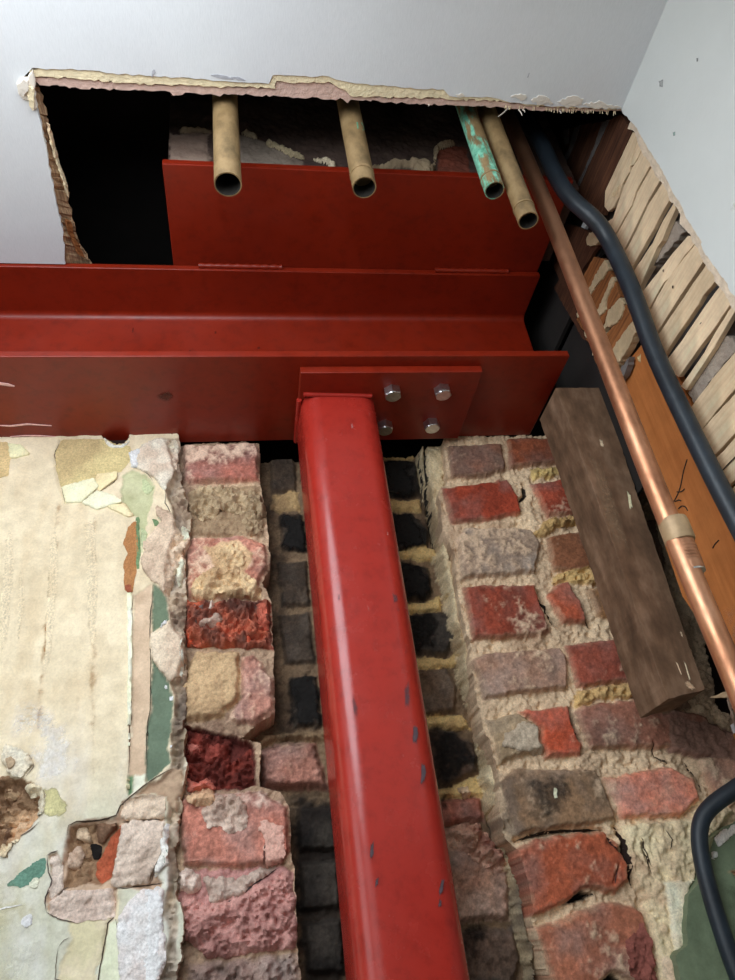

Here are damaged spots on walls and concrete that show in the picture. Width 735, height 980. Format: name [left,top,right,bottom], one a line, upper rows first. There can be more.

spalling [628,121,735,311]
spalling [61,437,272,701]
spalling [7,794,170,980]
spalling [177,866,297,959]
crack [513,827,651,885]
crack [652,743,700,788]